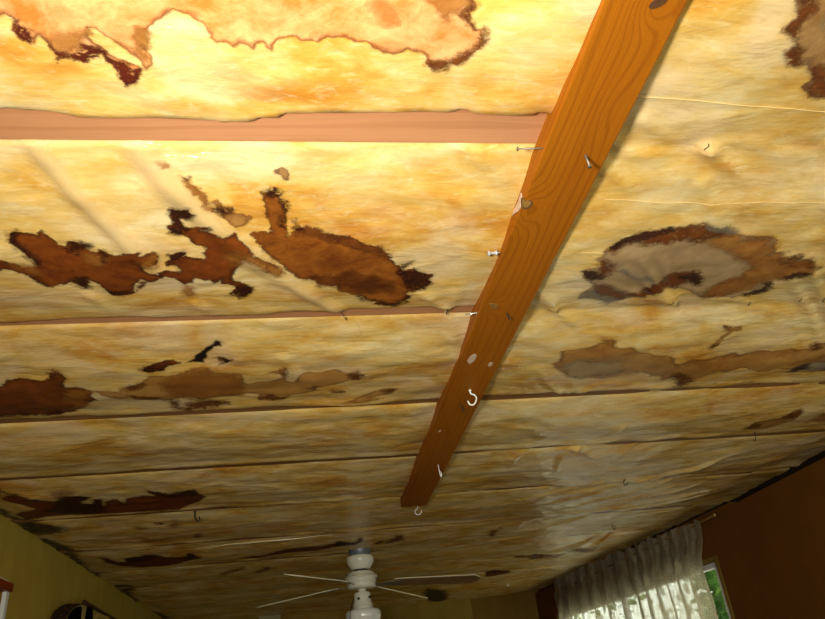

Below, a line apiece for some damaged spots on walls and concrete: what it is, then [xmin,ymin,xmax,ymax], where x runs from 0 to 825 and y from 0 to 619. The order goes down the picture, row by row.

water stain [0,0,489,87]
water stain [782,0,825,98]
water stain [0,177,433,307]
water stain [579,223,822,302]
water stain [0,341,363,418]
water stain [341,389,395,404]
water stain [554,326,825,386]
water stain [0,490,206,576]